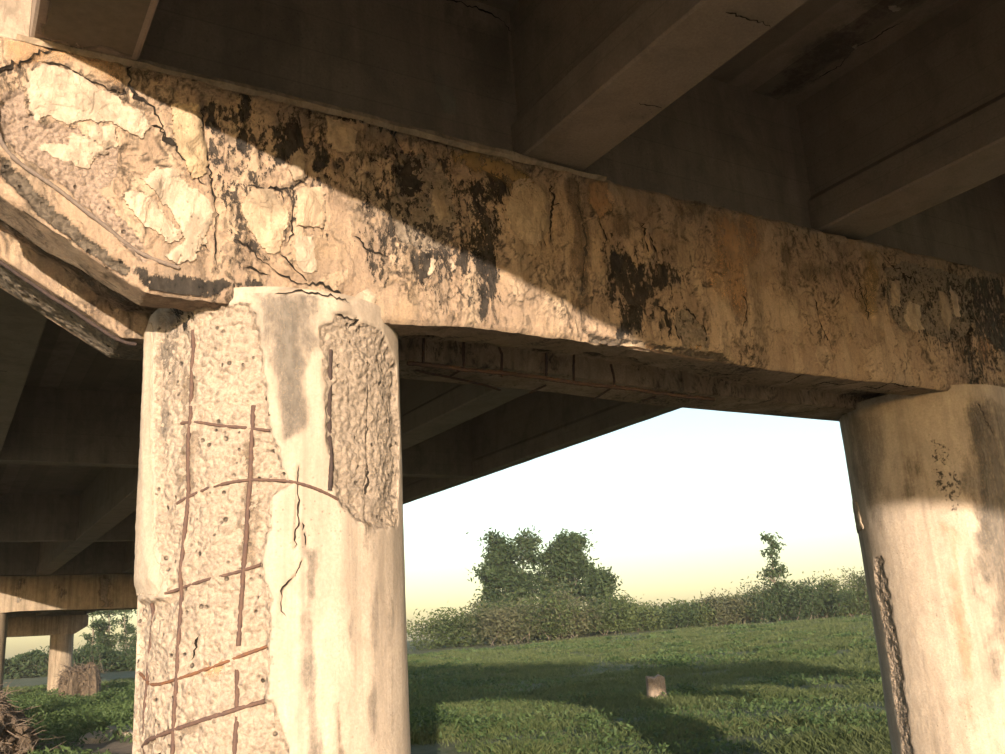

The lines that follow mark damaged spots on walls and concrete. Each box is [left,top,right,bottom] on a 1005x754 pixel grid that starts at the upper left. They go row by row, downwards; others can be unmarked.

spalling [0,63,214,276]
damp [161,308,194,368]
crack [0,48,359,328]
damp [134,94,341,297]
damp [262,296,316,437]
damp [352,142,511,323]
damp [565,178,694,343]
spalling [582,309,729,362]
damp [881,253,1005,384]
spalling [0,260,399,754]
crack [280,467,306,616]
damp [962,402,1005,636]